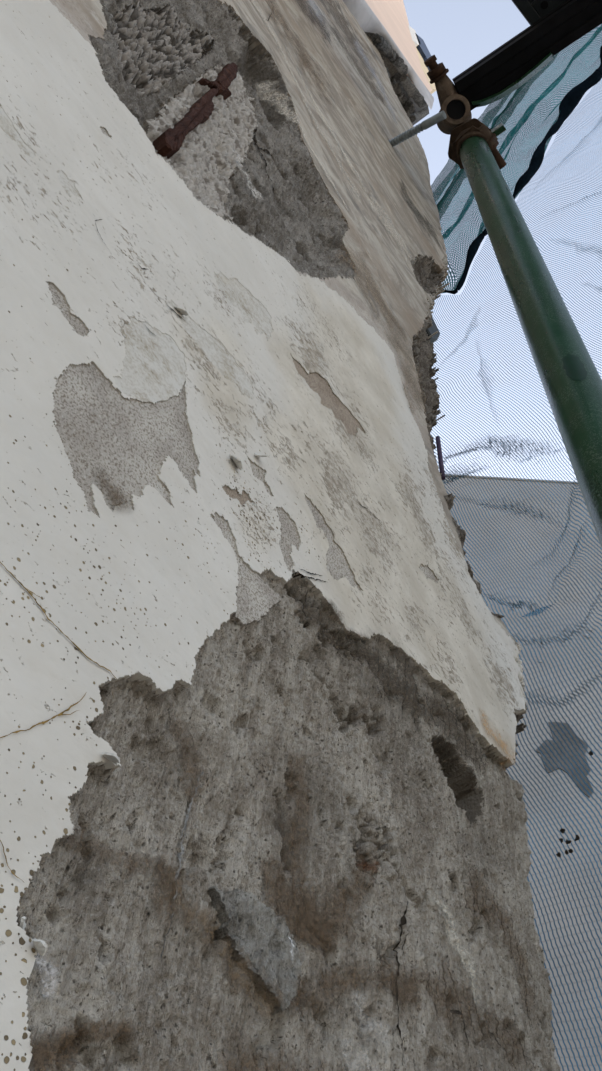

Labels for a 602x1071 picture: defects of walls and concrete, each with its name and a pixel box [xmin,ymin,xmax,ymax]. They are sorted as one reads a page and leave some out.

spalling [88,0,355,279]
peeling [52,316,199,516]
peeling [170,300,253,399]
peeling [223,486,252,506]
peeling [229,453,272,496]
peeling [293,360,364,436]
crack [0,562,117,698]
crack [0,693,86,738]
spalling [16,493,560,1071]
crack [393,886,408,1065]